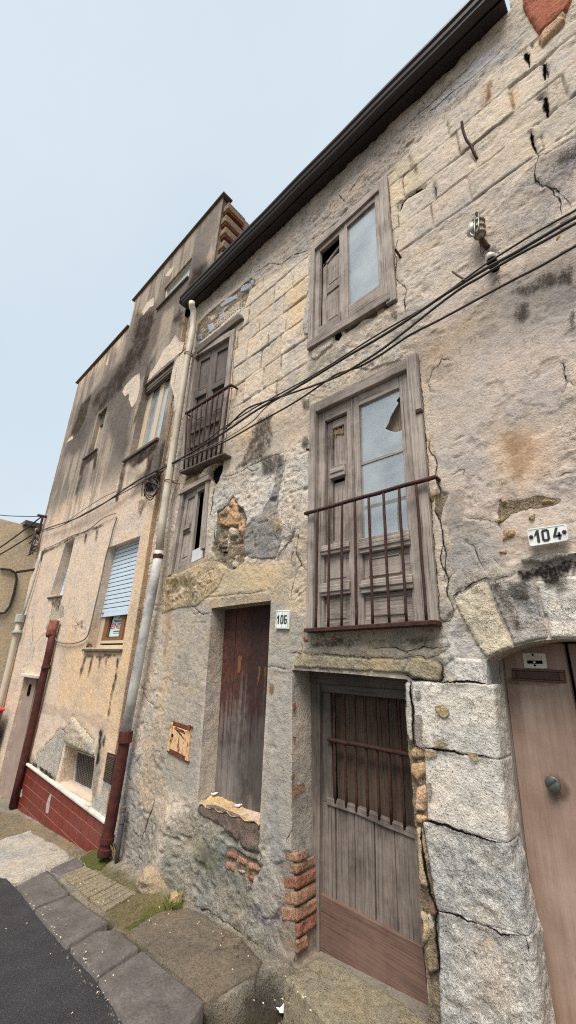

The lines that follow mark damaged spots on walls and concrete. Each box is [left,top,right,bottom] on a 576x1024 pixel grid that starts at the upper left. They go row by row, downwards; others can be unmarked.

flaking render [523,0,572,48]
crack [531,134,572,215]
flaking render [123,278,255,411]
leakage [71,394,91,436]
leakage [115,440,165,500]
leakage [261,453,283,476]
flaking render [211,497,247,570]
crack [267,358,515,683]
flaking render [497,495,561,554]
leakage [80,654,118,715]